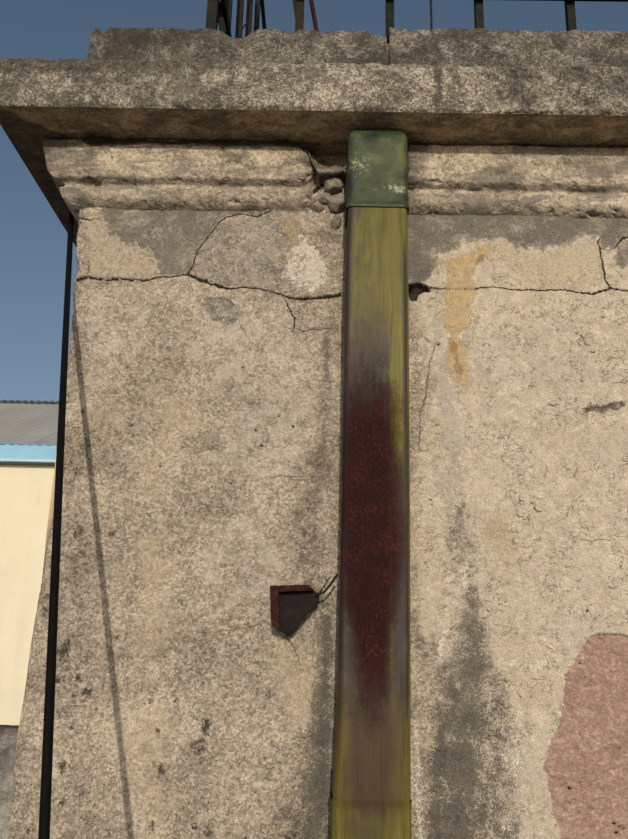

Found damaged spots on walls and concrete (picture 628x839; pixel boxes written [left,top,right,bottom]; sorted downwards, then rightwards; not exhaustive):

crack [76,211,342,332]
rust [437,244,491,394]
crack [408,236,628,296]
crack [418,341,437,452]
damp [412,312,530,839]
flaking render [543,633,628,839]